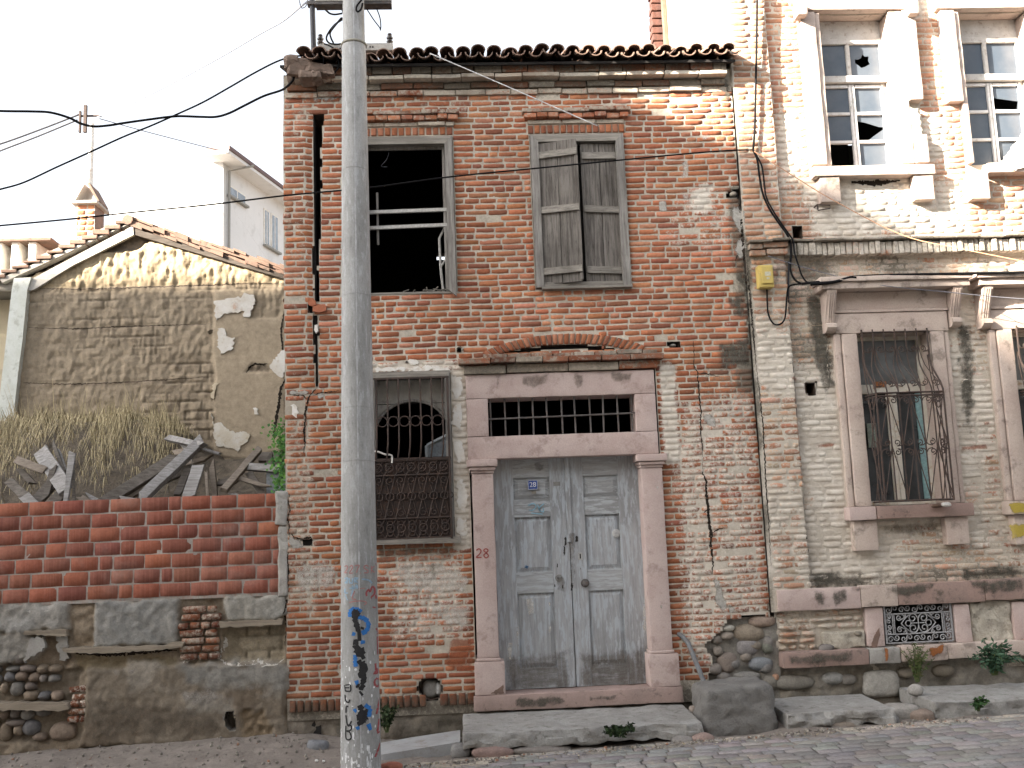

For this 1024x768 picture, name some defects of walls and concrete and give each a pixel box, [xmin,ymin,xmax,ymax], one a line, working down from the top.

crack [273,114,339,453]
peeling [214,293,256,354]
peeling [246,350,285,378]
leakage [807,295,834,390]
leakage [957,325,975,423]
peeling [210,413,250,452]
crack [693,342,723,574]
leakage [814,573,862,604]
leakage [892,584,933,596]
leakage [963,567,1022,593]